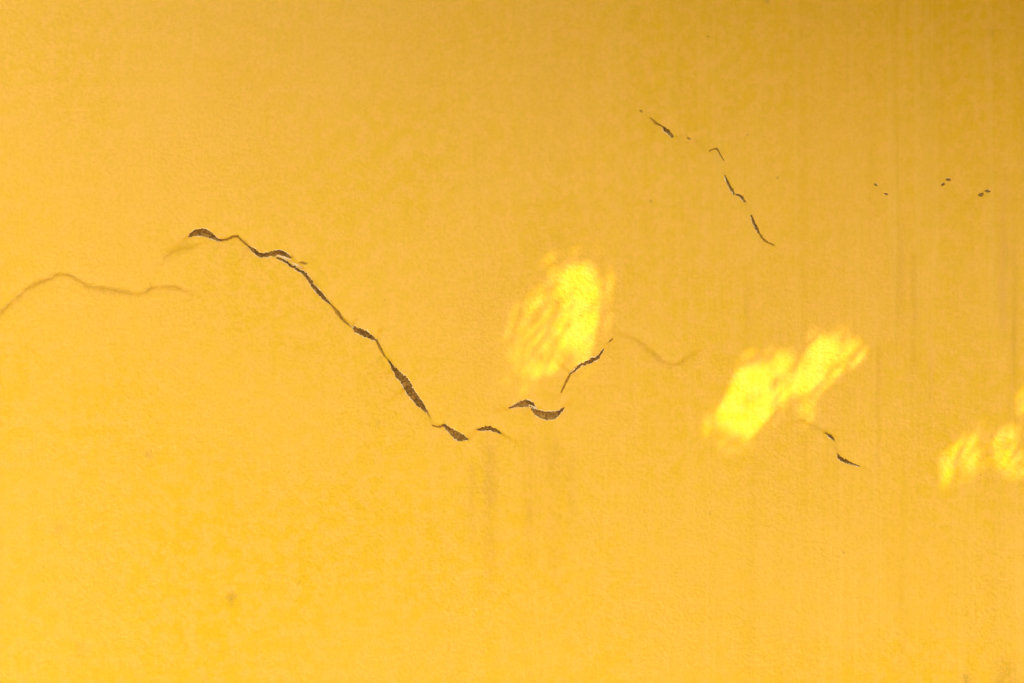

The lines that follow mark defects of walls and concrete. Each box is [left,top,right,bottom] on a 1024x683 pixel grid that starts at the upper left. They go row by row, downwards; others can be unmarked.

crack [639,110,774,246]
crack [0,273,187,316]
crack [164,228,693,442]
crack [794,420,859,467]